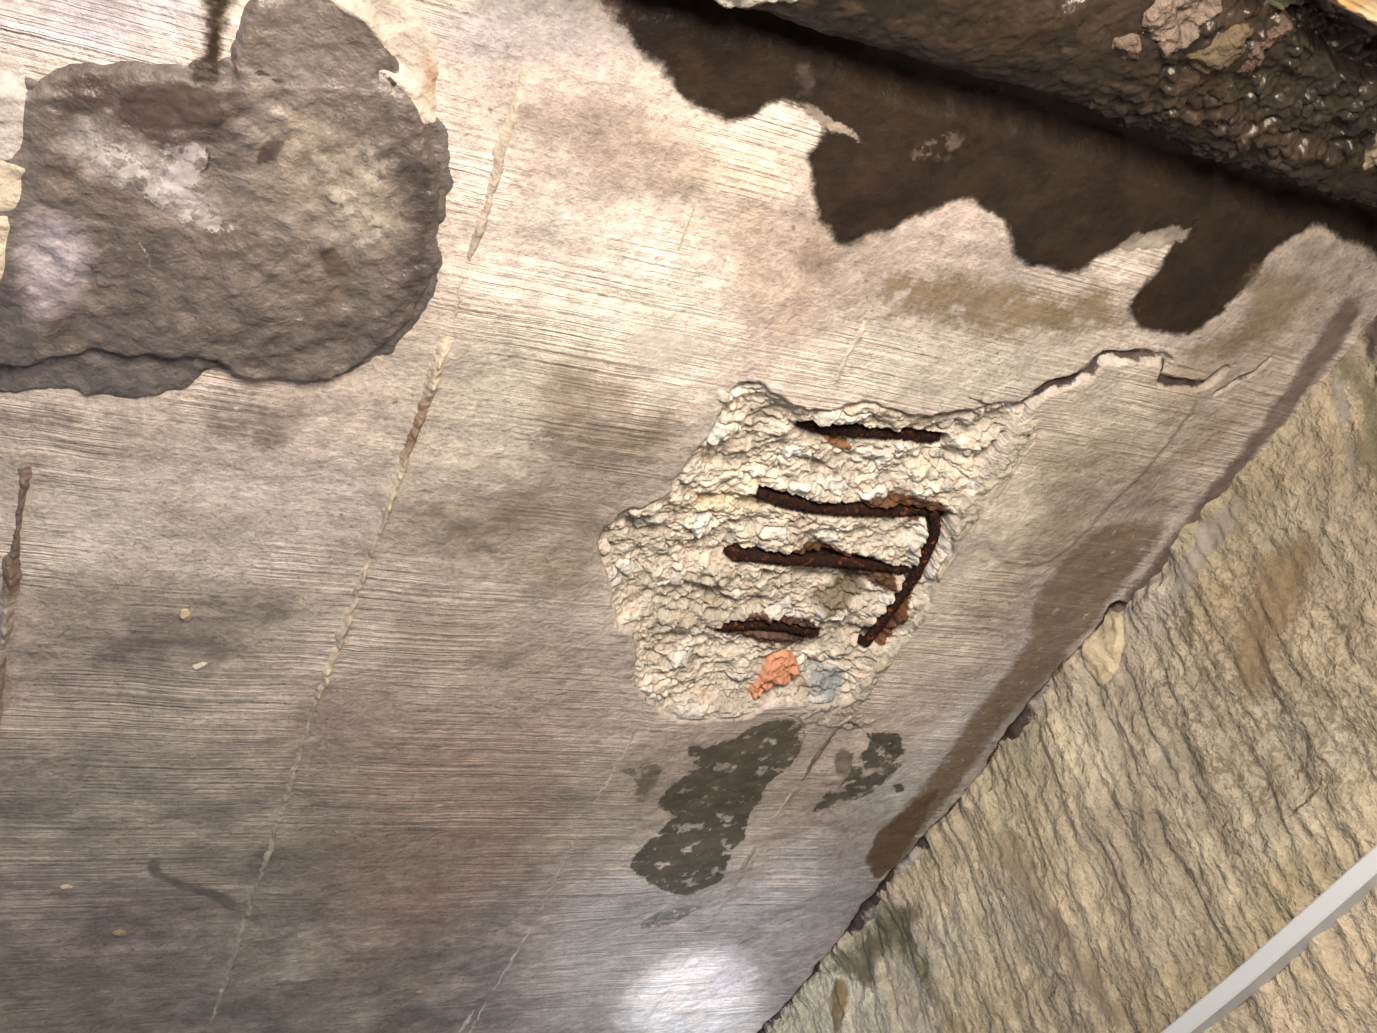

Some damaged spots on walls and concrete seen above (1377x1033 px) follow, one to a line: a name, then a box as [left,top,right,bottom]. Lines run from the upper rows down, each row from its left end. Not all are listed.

damp [119,0,234,128]
damp [325,0,439,124]
damp [257,141,284,164]
damp [602,0,1377,348]
crack [969,349,1258,405]
corrosion [822,433,852,450]
corrosion [725,611,817,646]
spalling [598,381,1042,730]
corrosion [771,540,912,645]
corrosion [861,492,949,521]
damp [813,299,1377,878]
damp [623,719,806,929]